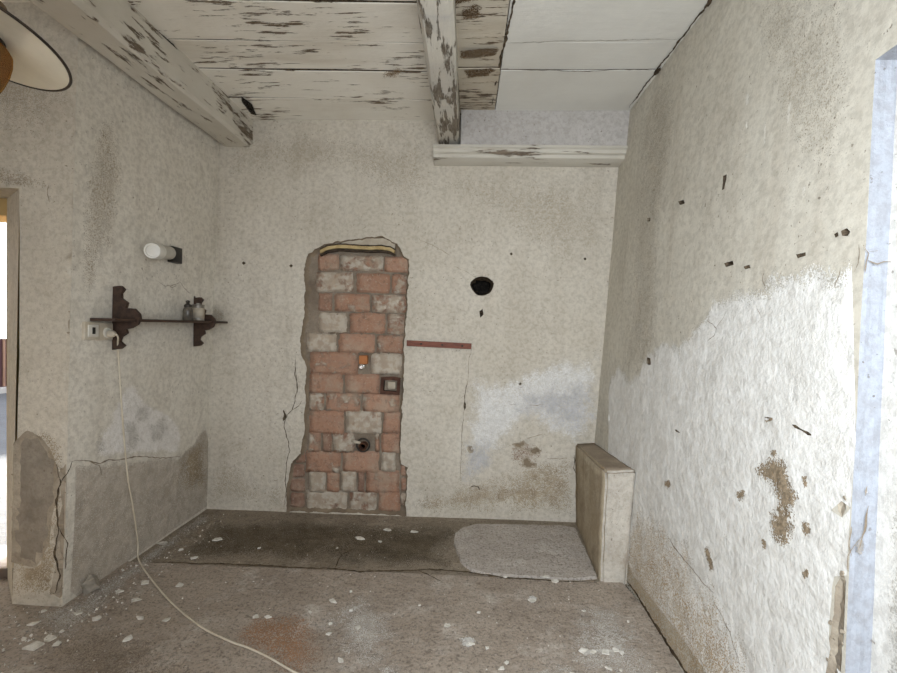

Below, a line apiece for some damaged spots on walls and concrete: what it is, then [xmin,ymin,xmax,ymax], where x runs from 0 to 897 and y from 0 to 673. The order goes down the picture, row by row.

crack [492,0,712,108]
damp [417,84,856,673]
flaking render [11,431,66,598]
crack [53,456,179,593]
damp [33,429,458,673]